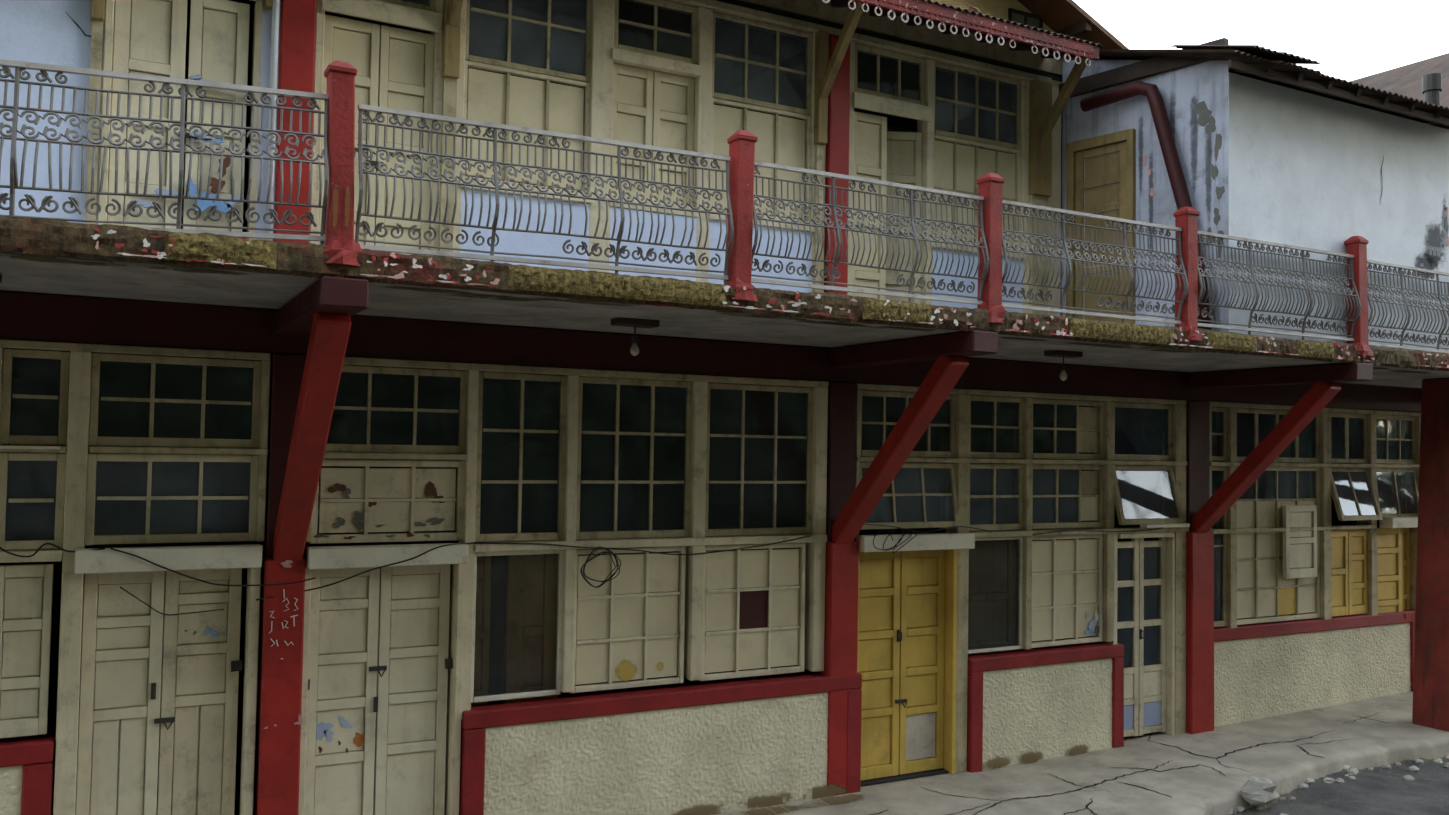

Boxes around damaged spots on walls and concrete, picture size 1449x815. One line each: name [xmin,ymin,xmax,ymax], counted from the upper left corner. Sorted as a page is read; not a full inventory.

water stain [1170,96,1211,211]
water stain [1139,119,1153,249]
peeling [91,228,266,267]
peeling [359,252,500,286]
peeling [1004,314,1073,336]
peeling [313,481,446,539]
crack [921,712,1387,815]